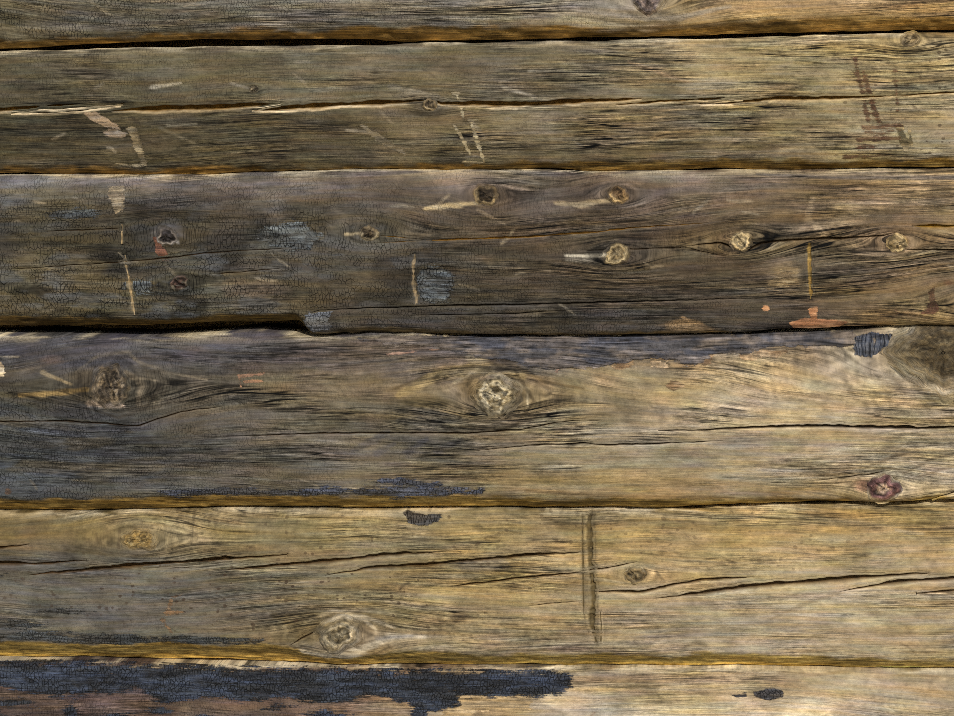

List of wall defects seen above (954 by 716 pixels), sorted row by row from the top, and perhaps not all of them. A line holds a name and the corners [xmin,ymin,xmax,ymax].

rust [790,306,847,328]
crack [0,542,954,607]
peeling [443,693,533,716]